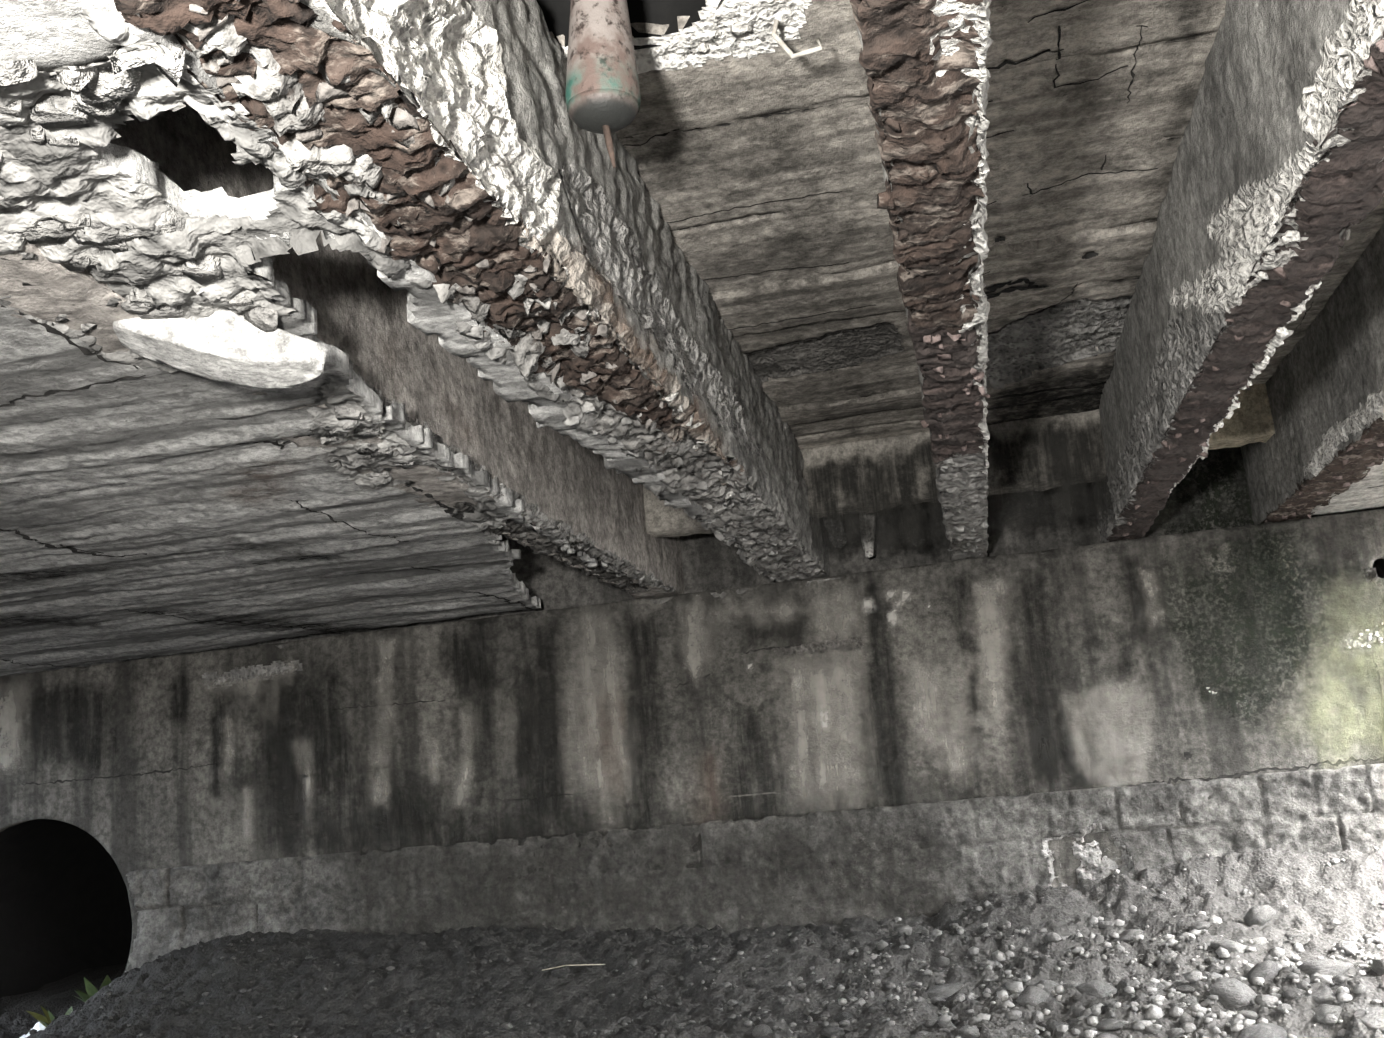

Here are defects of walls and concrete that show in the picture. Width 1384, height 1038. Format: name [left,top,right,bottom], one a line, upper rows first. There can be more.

crack [986,0,1148,138]
crack [0,305,145,407]
crack [0,529,147,557]
crack [236,435,313,450]
spalling [0,0,825,595]
spalling [743,0,1133,561]
crack [982,271,1078,315]
spalling [1096,0,1384,543]
damp [0,685,116,775]
damp [212,619,949,935]
damp [794,585,909,807]
damp [955,577,1096,795]